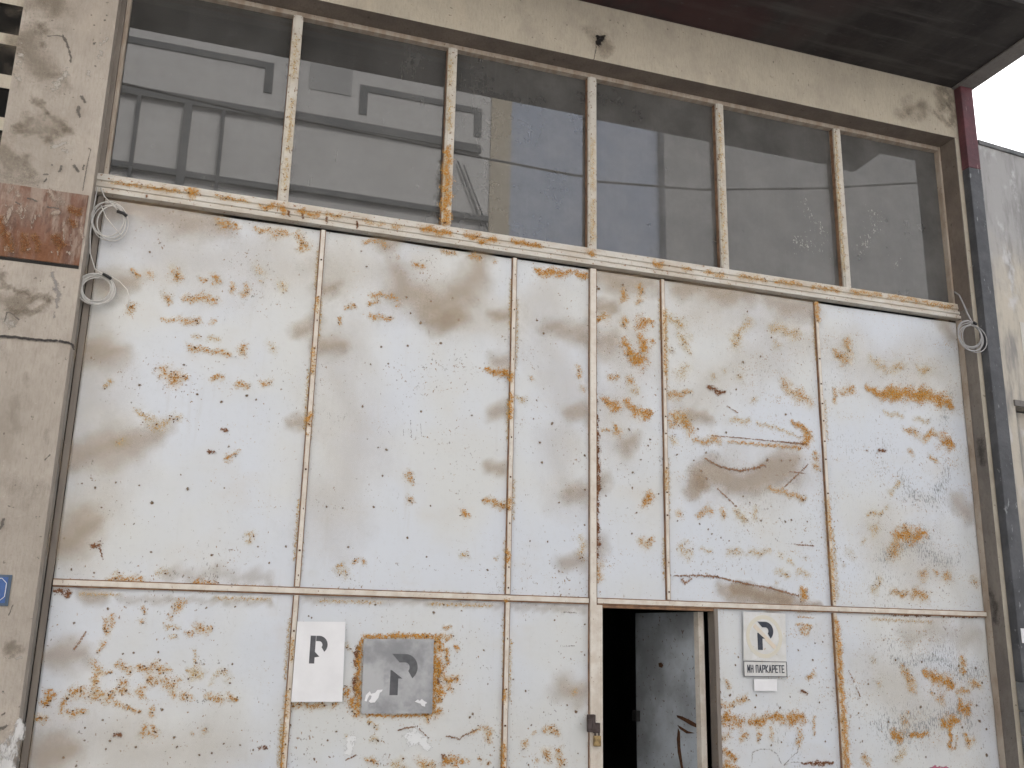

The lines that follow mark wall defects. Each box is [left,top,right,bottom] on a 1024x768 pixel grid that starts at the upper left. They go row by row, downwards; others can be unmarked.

corrosion [419,146,454,236]
crack [0,312,75,350]
corrosion [132,407,181,431]
corrosion [152,361,189,389]
corrosion [130,265,287,358]
corrosion [210,98,343,437]
corrosion [577,273,957,768]
peeling [0,713,26,768]
corrosion [34,570,238,748]
corrosion [239,618,461,768]
corrosion [888,655,987,762]